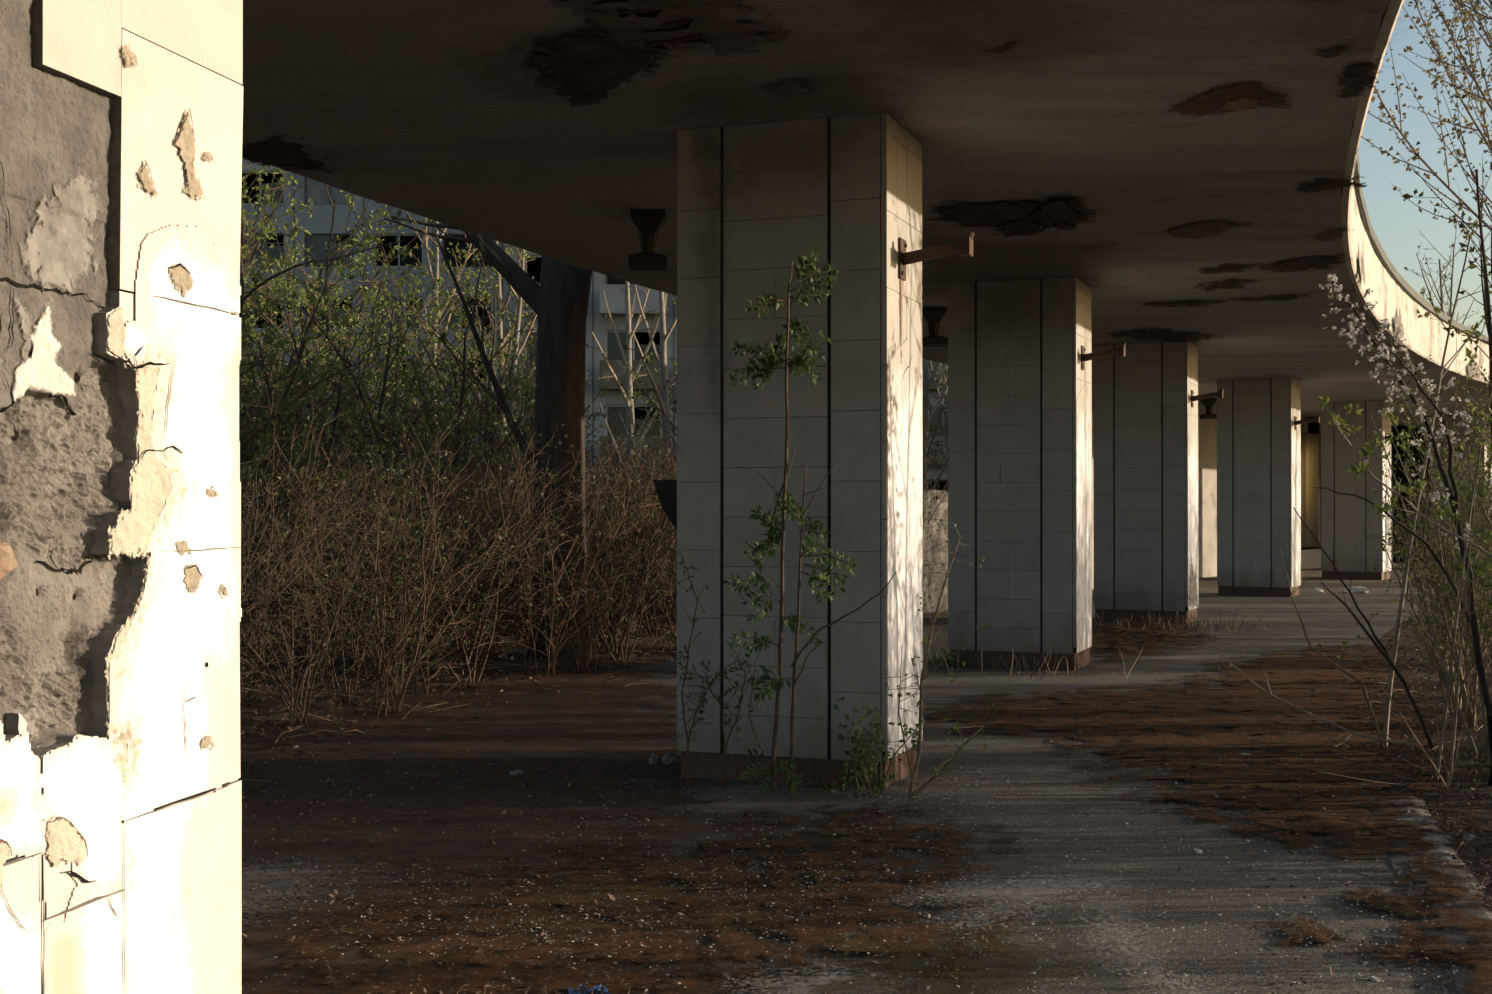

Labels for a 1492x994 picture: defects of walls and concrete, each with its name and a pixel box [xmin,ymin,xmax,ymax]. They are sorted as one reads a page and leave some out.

spalling [1313,46,1382,98]
spalling [1166,82,1292,116]
spalling [242,135,339,173]
spalling [929,194,1099,237]
spalling [1142,228,1366,309]
spalling [1098,328,1224,343]